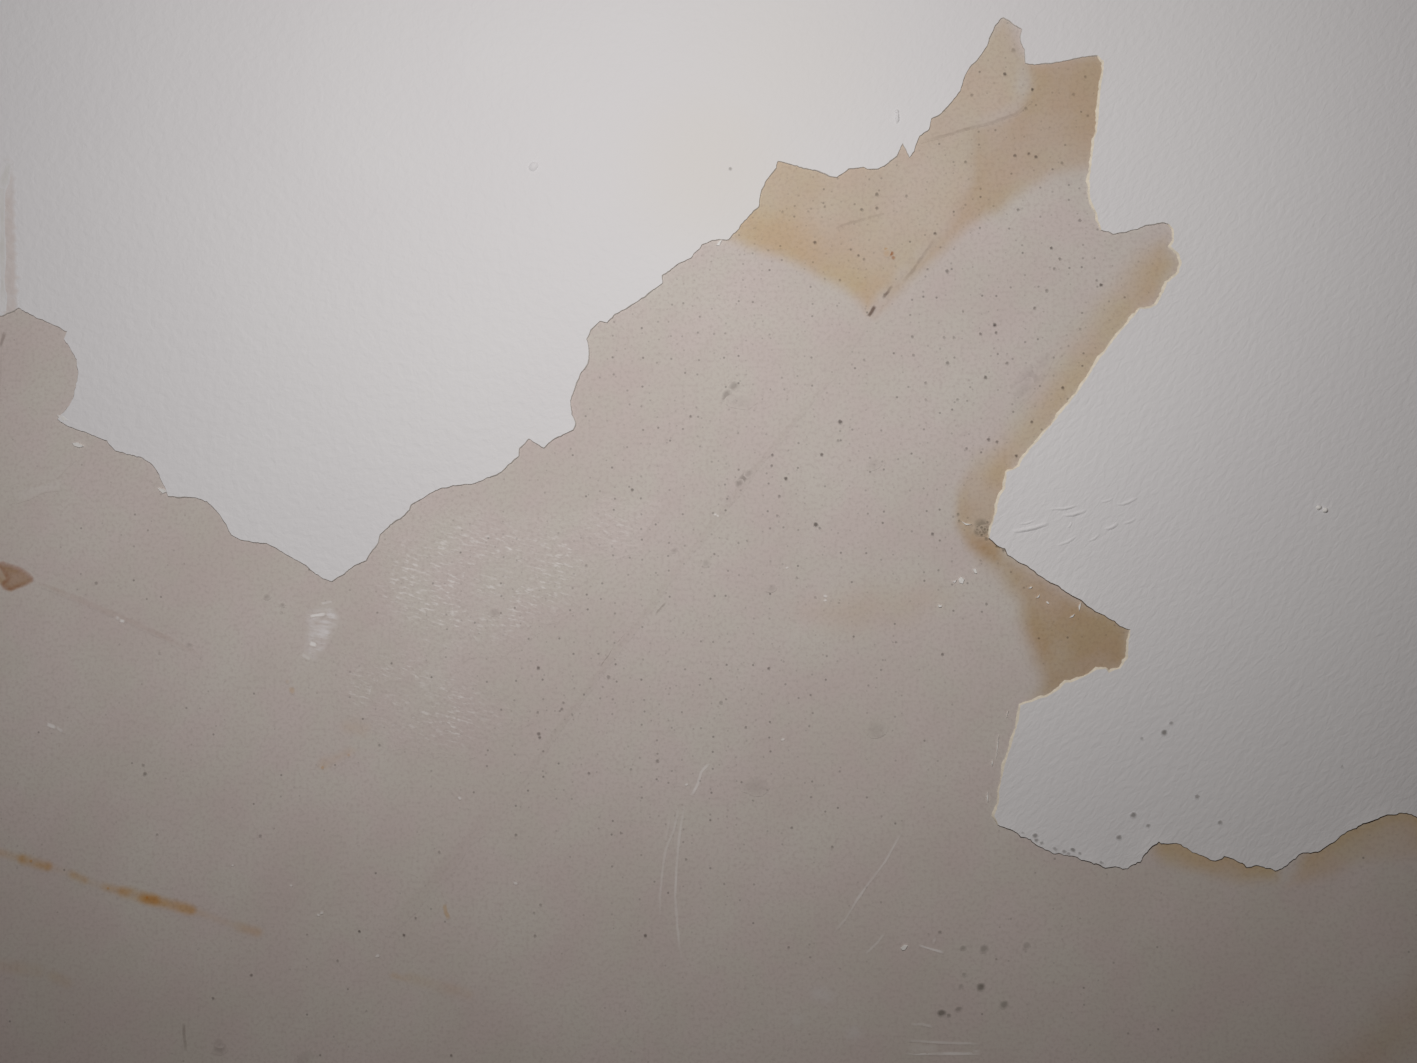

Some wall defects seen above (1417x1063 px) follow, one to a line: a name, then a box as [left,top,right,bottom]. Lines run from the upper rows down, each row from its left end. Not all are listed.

peeling [693,17,1082,255]
damp [722,18,1102,324]
peeling [1086,55,1104,231]
peeling [988,224,1182,629]
peeling [991,629,1131,825]
damp [1129,812,1417,892]